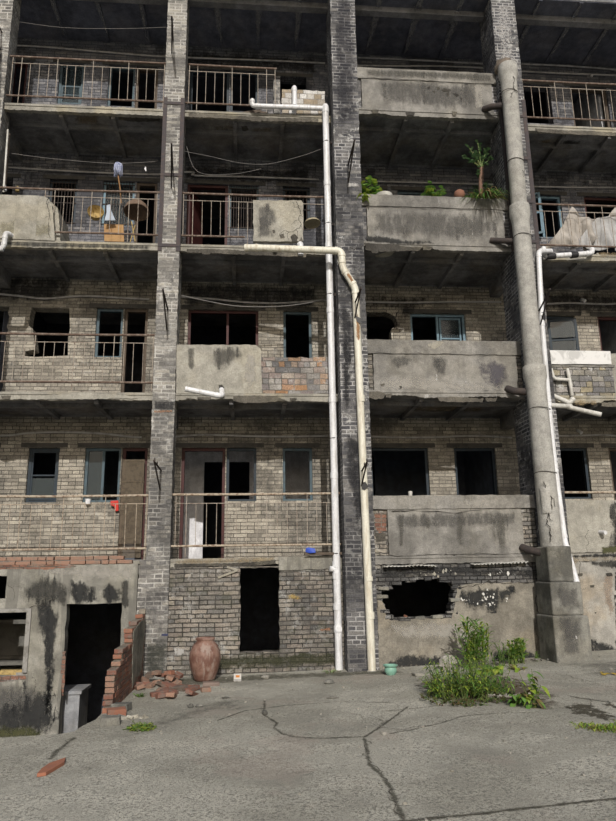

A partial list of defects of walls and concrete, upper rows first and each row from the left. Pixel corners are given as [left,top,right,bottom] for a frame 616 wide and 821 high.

leakage [260,204,275,236]
leakage [214,347,255,382]
leakage [385,358,471,398]
leakage [480,362,506,388]
leakage [398,500,513,545]
crack [543,482,556,542]
spalling [376,569,495,621]
leakage [0,568,131,733]
crack [220,699,616,821]